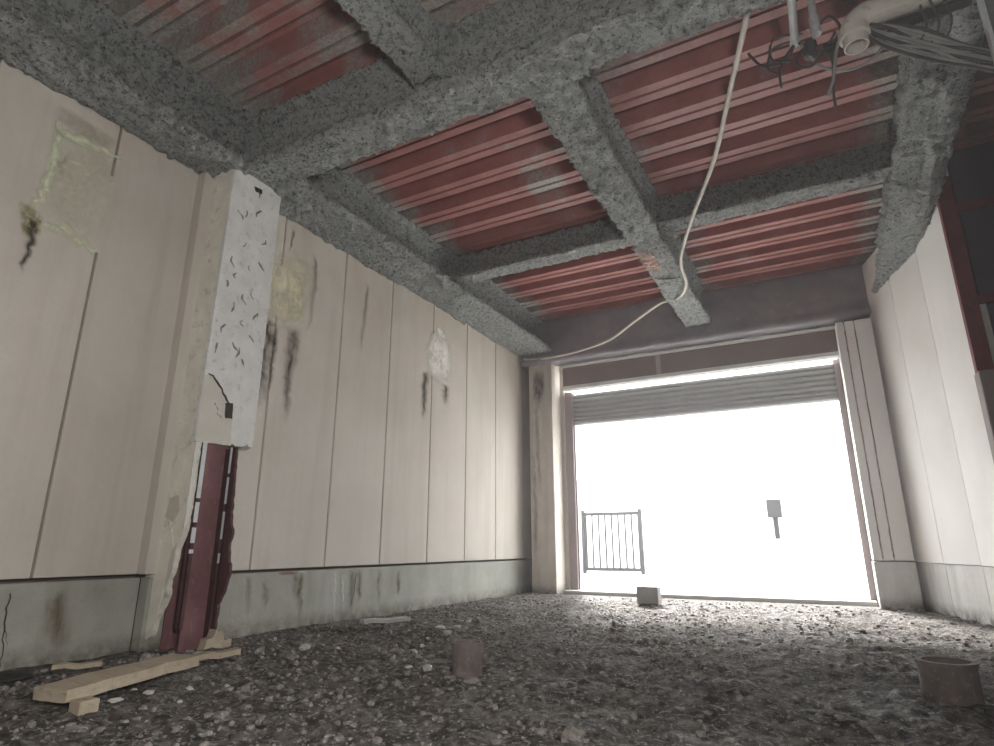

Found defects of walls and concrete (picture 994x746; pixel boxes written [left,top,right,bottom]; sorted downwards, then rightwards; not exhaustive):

damp [260,322,277,387]
damp [285,333,297,397]
peeling [145,495,180,632]